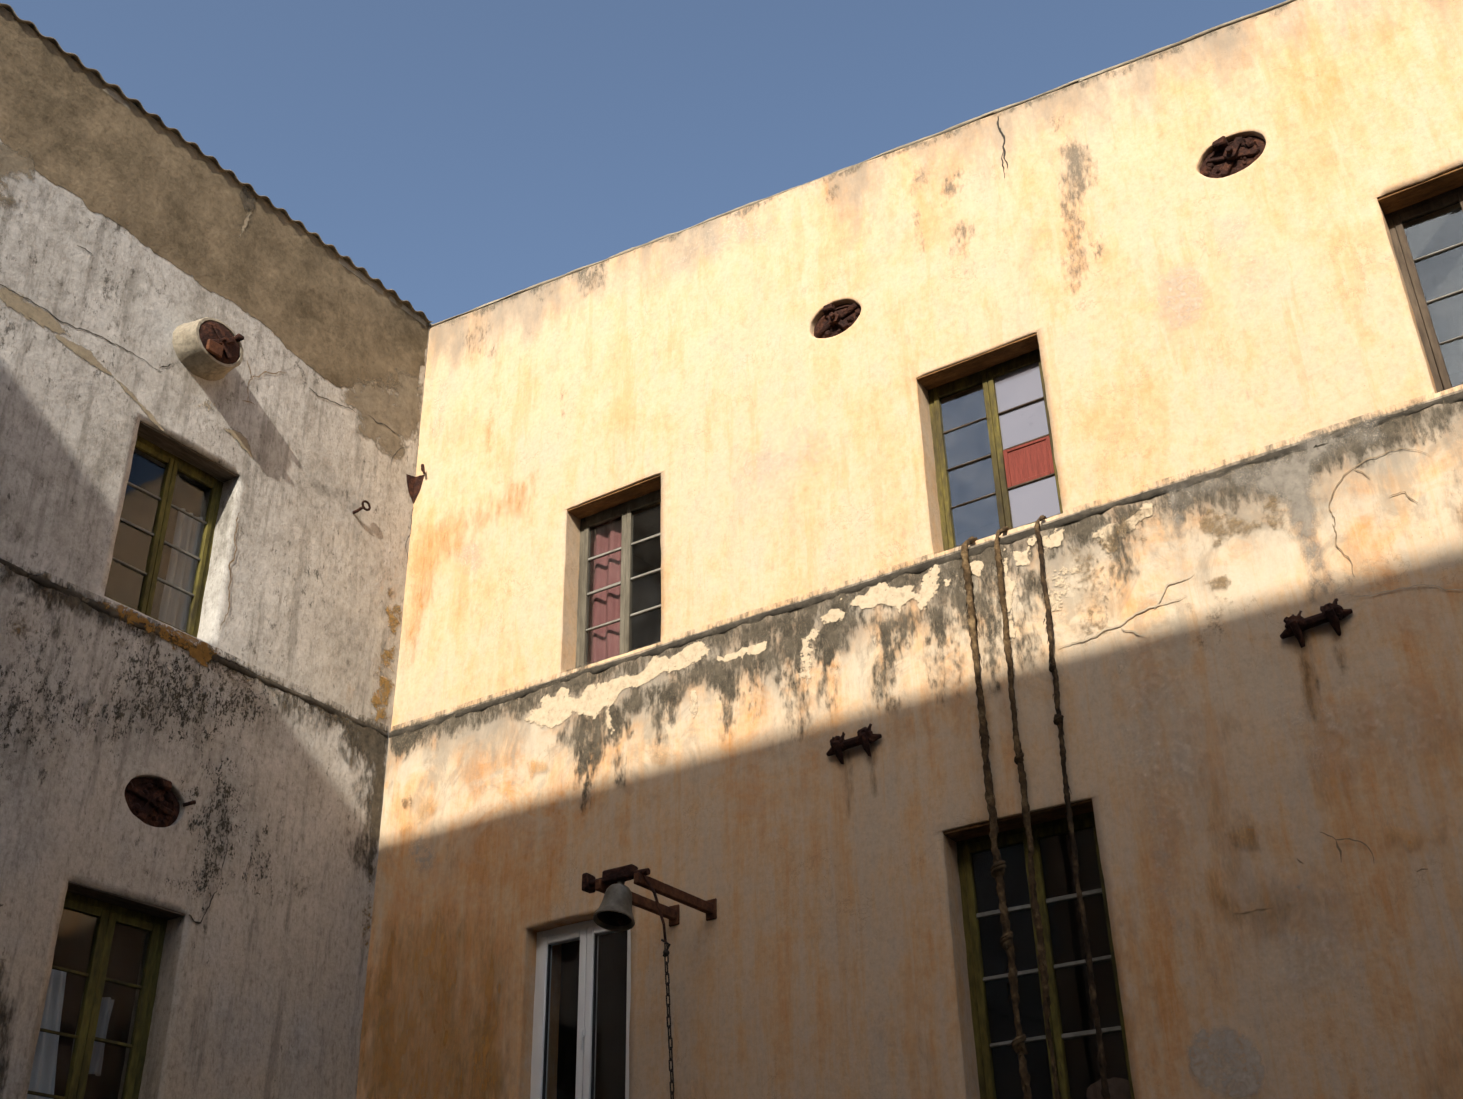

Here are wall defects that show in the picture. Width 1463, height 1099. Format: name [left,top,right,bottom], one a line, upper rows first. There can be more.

crack [997,116,1008,178]
water stain [1062,146,1090,273]
crack [0,284,171,372]
crack [1329,448,1427,577]
peeling [524,641,767,735]
water stain [0,386,1463,948]
crack [1058,574,1193,649]
water stain [0,950,14,1091]
water stain [369,922,501,1099]